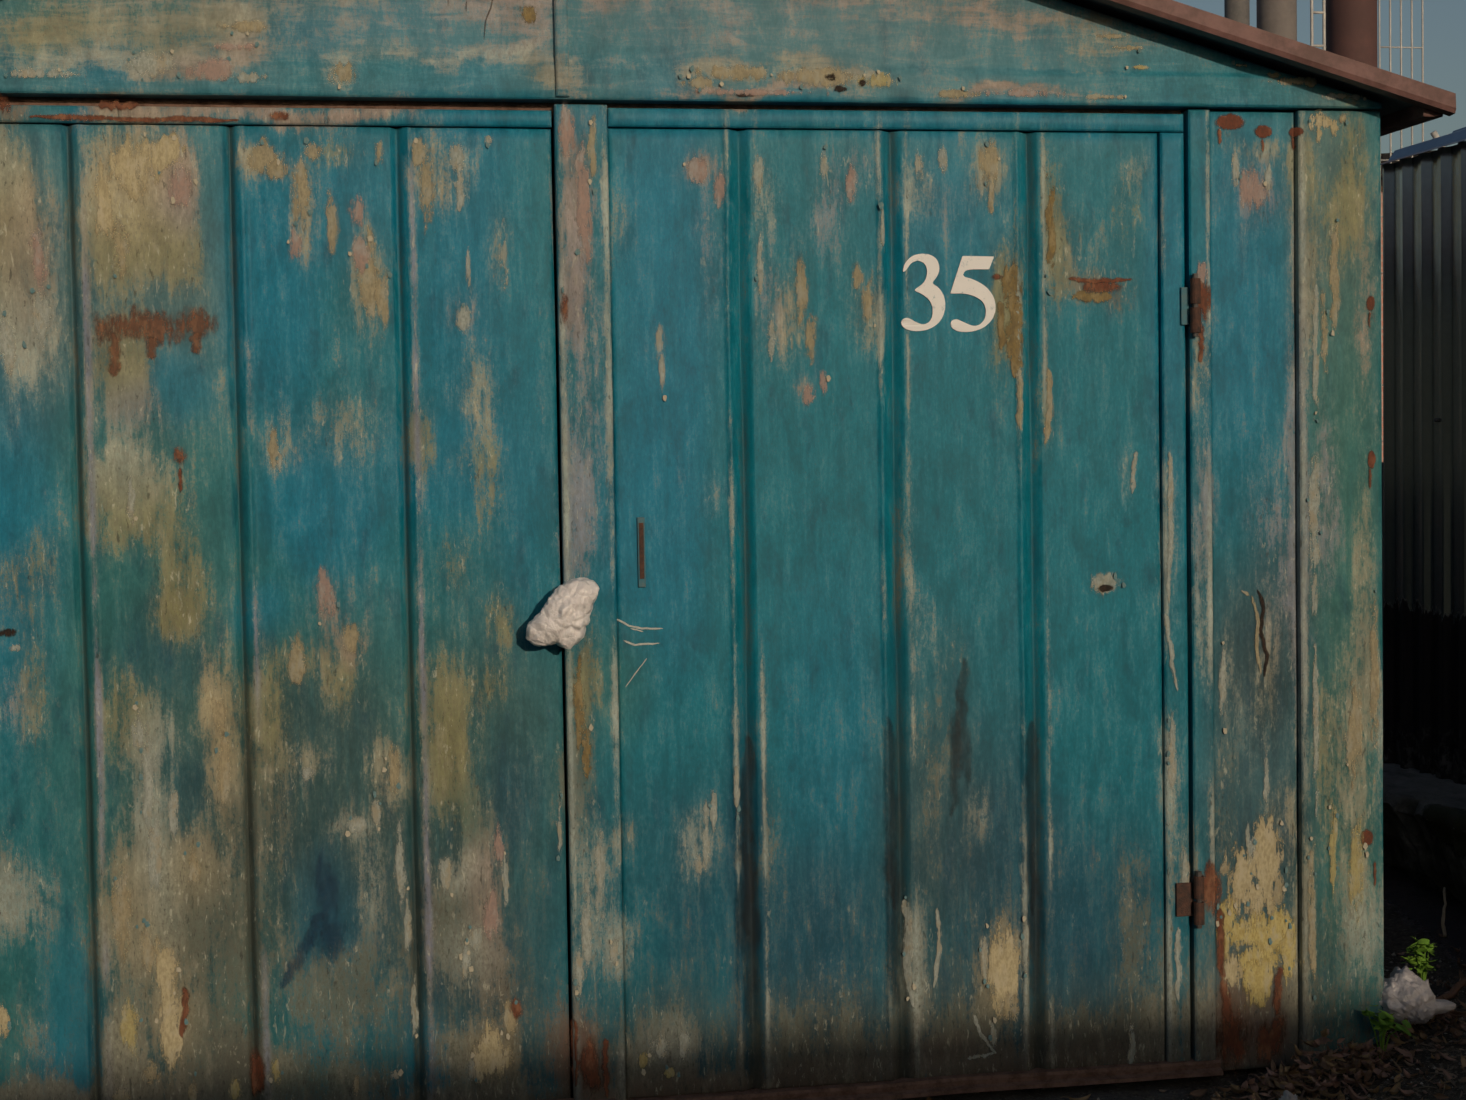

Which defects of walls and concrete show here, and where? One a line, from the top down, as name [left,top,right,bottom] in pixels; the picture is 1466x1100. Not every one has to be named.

peeling [95,132,198,278]
peeling [678,65,902,97]
corrosion [1217,113,1304,151]
corrosion [95,305,214,376]
corrosion [1068,277,1132,303]
corrosion [1191,263,1211,362]
peeling [1307,459,1323,613]
crack [1242,589,1269,677]
peeling [1346,590,1380,789]
peeling [1216,641,1369,1008]
peeling [111,875,189,1083]
corrosion [1202,860,1286,1071]